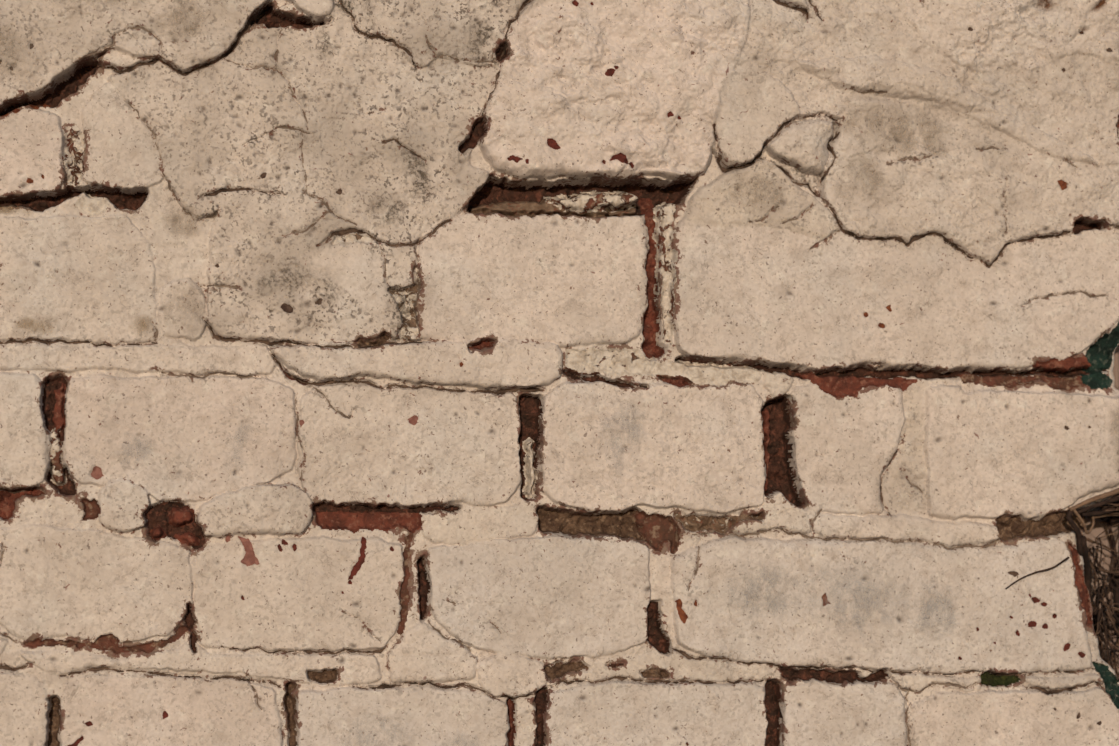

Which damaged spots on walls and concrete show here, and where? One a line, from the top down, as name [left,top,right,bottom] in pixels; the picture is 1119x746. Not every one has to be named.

crack [714,114,1070,268]
crack [84,0,543,481]
crack [1026,290,1106,305]
crack [0,322,158,347]
spalling [795,372,918,399]
peeling [225,535,260,566]
peeling [342,537,367,594]
spalling [632,511,681,554]
crack [688,438,1000,591]
spalling [1068,544,1095,634]